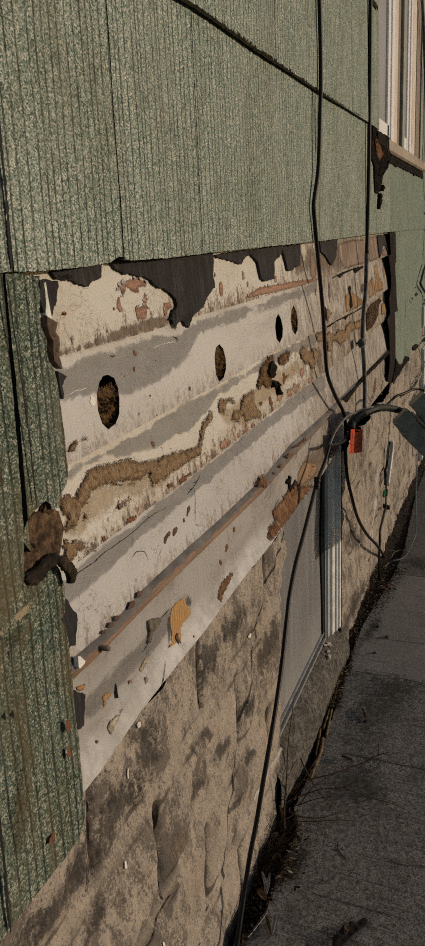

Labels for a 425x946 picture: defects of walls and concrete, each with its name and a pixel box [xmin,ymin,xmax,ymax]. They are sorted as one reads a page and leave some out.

peeling [41,282,52,319]
peeling [114,275,150,321]
peeling [242,252,317,299]
peeling [337,235,391,316]
spalling [341,350,390,402]
water stain [64,474,168,533]
water stain [85,611,171,715]
peeling [170,598,191,647]
water stain [195,601,256,697]
water stain [238,616,280,718]
water stain [228,748,281,814]
water stain [14,710,167,946]